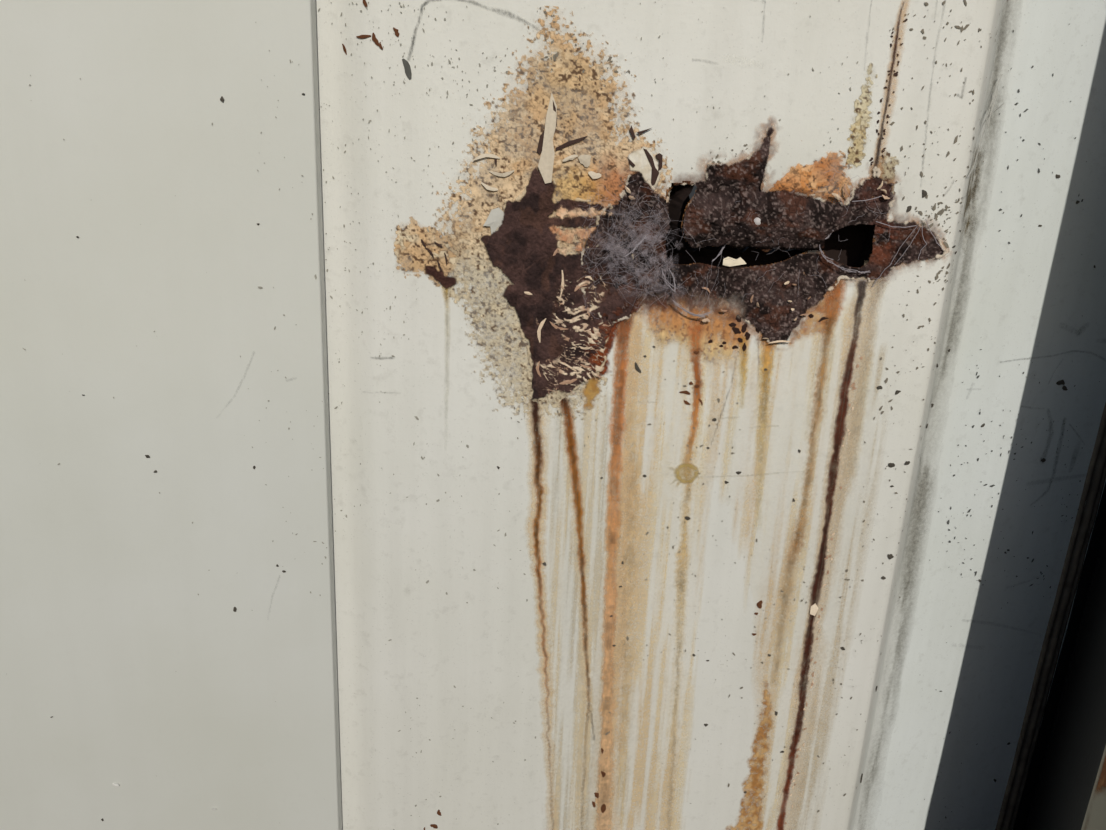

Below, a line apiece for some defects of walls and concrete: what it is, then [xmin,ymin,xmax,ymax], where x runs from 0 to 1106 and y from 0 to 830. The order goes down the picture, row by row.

peeling [628,125,663,187]
rust [478,125,948,830]